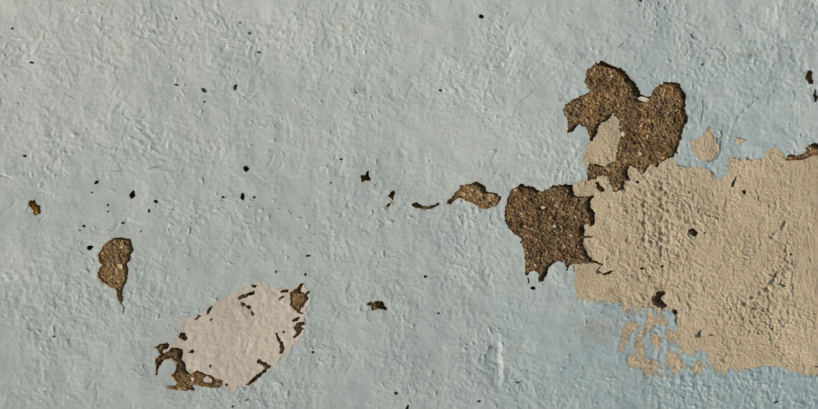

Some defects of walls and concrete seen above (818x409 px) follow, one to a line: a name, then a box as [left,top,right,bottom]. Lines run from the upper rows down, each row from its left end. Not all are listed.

peeling [29,200,41,216]
peeling [446,62,818,378]
flaking render [88,237,134,314]
peeling [154,273,310,393]
peeling [367,301,387,310]